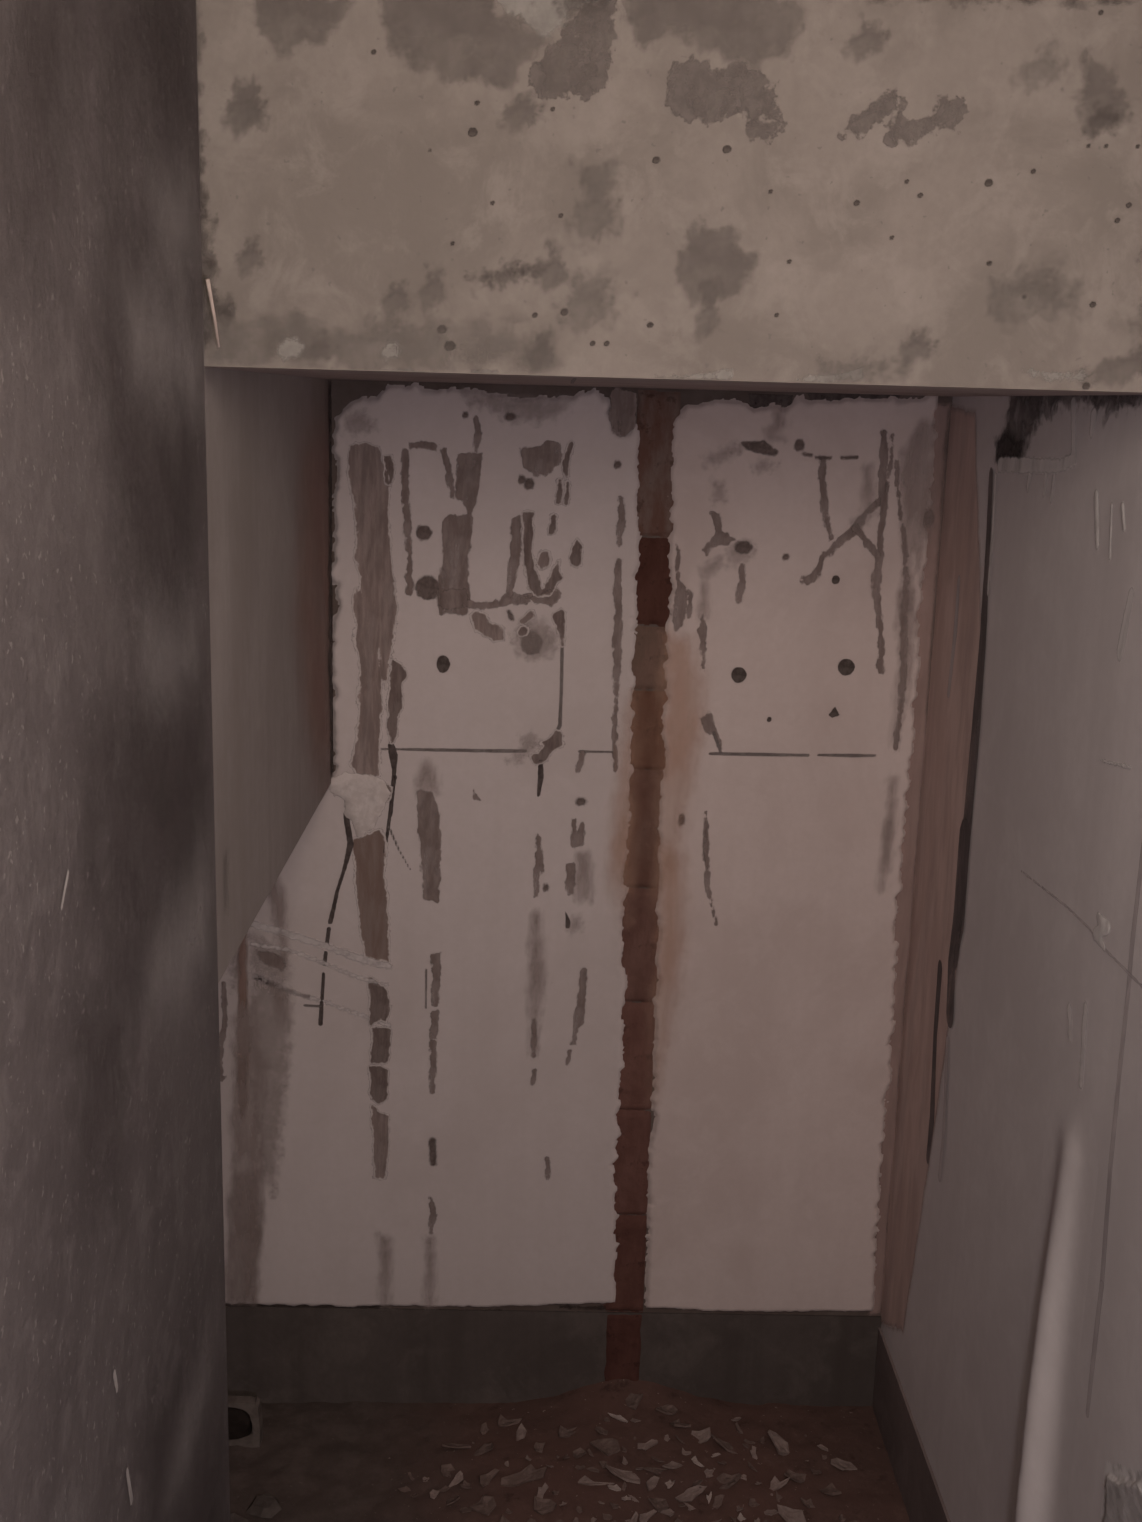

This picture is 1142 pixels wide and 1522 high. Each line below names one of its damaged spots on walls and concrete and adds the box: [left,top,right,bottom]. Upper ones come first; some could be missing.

water stain [257,0,342,41]
water stain [385,0,540,86]
water stain [199,146,235,345]
water stain [680,229,756,329]
water stain [401,412,575,730]
crack [304,744,527,1026]
water stain [417,769,441,903]
water stain [219,884,391,1303]
water stain [425,953,441,1094]
water stain [428,1198,437,1234]